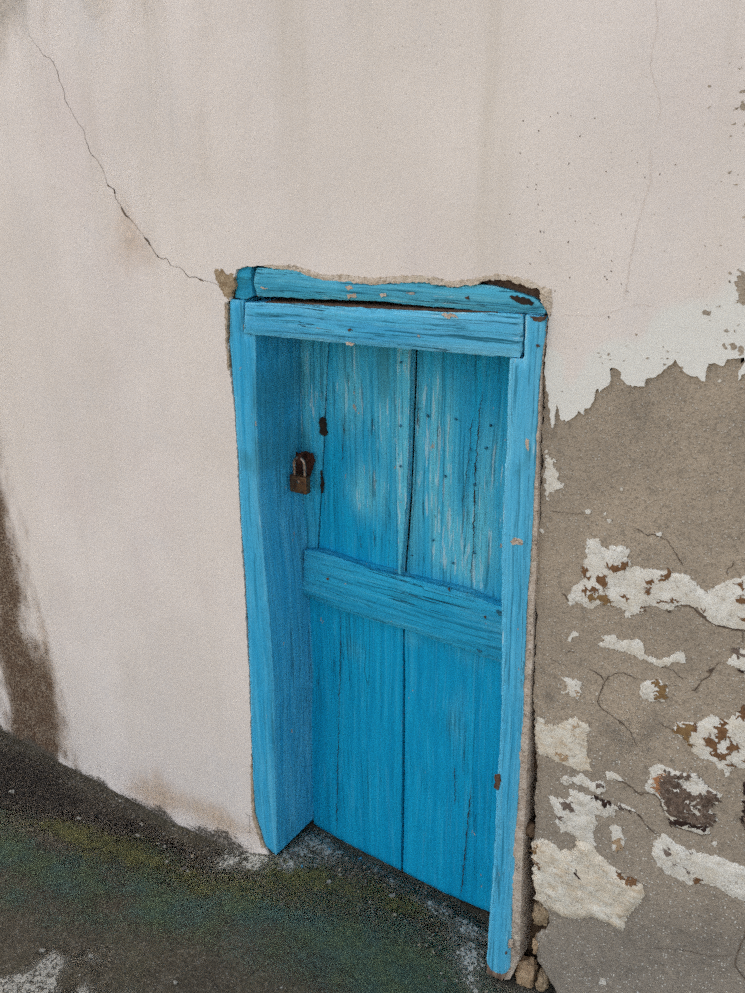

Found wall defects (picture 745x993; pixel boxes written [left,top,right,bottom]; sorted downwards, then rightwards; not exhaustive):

crack [28,33,208,282]
peeling [728,269,745,305]
water stain [0,490,485,993]
crack [550,651,637,746]
peeling [529,325,745,993]
peeling [424,899,488,993]
crack [658,931,745,980]